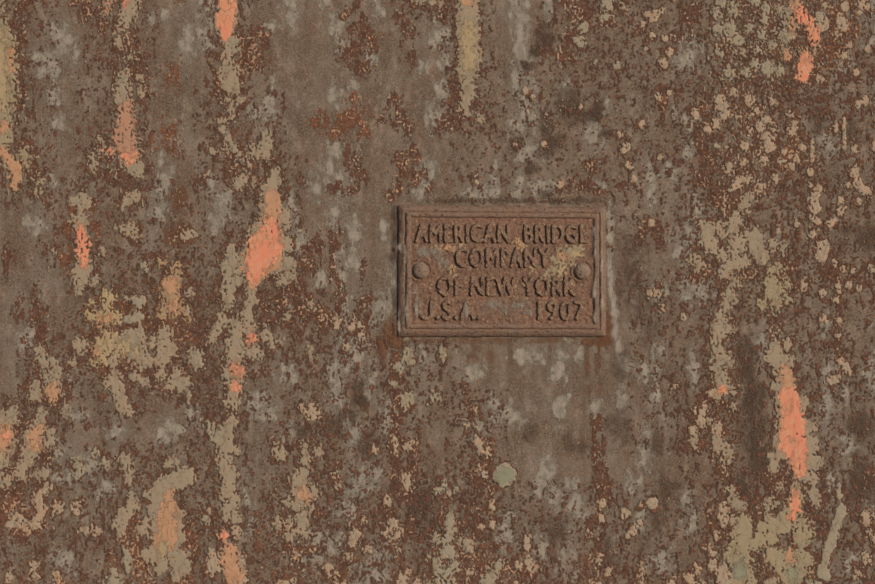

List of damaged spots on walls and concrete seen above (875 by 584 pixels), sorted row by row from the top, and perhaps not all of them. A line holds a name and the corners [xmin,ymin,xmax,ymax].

corrosion [8,0,54,189]
corrosion [68,0,187,165]
corrosion [304,0,453,205]
corrosion [522,0,618,74]
corrosion [658,0,861,228]
corrosion [0,137,143,584]
corrosion [76,277,196,410]
corrosion [261,217,557,584]
corrosion [104,505,205,584]
corrosion [577,413,627,584]
peeling [634,482,679,526]
peeling [644,485,702,563]